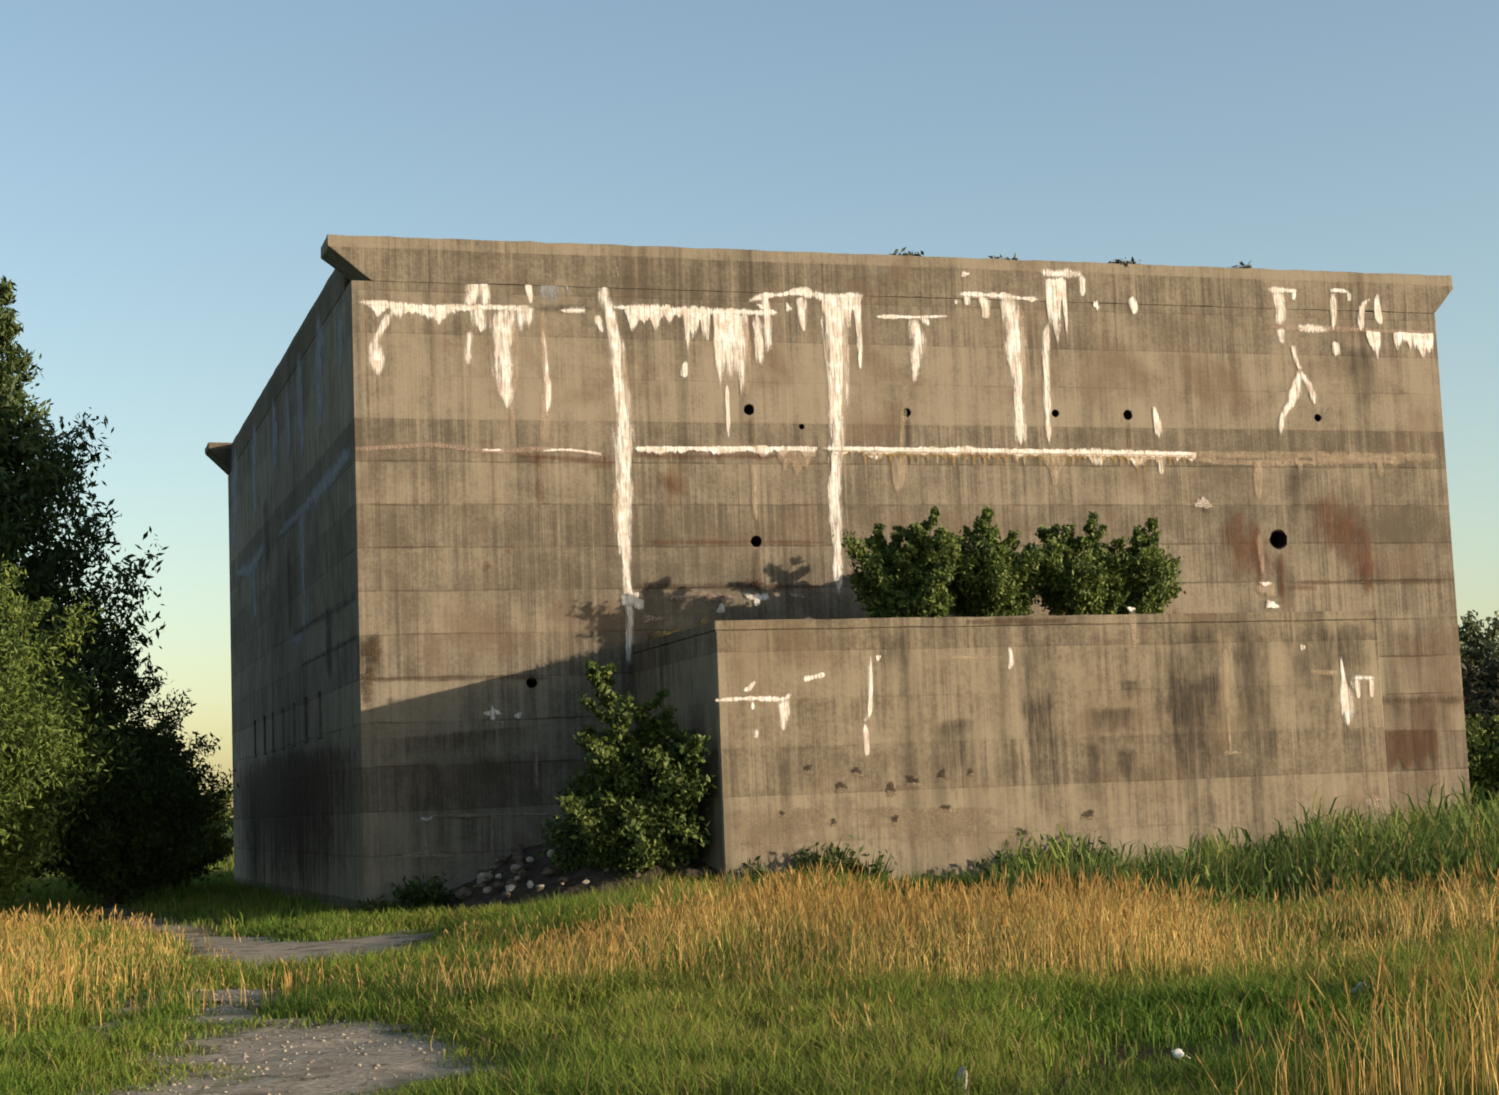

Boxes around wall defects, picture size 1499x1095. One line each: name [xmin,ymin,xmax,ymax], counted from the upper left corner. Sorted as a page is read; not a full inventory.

water stain [231,268,1434,661]
water stain [1300,634,1374,725]